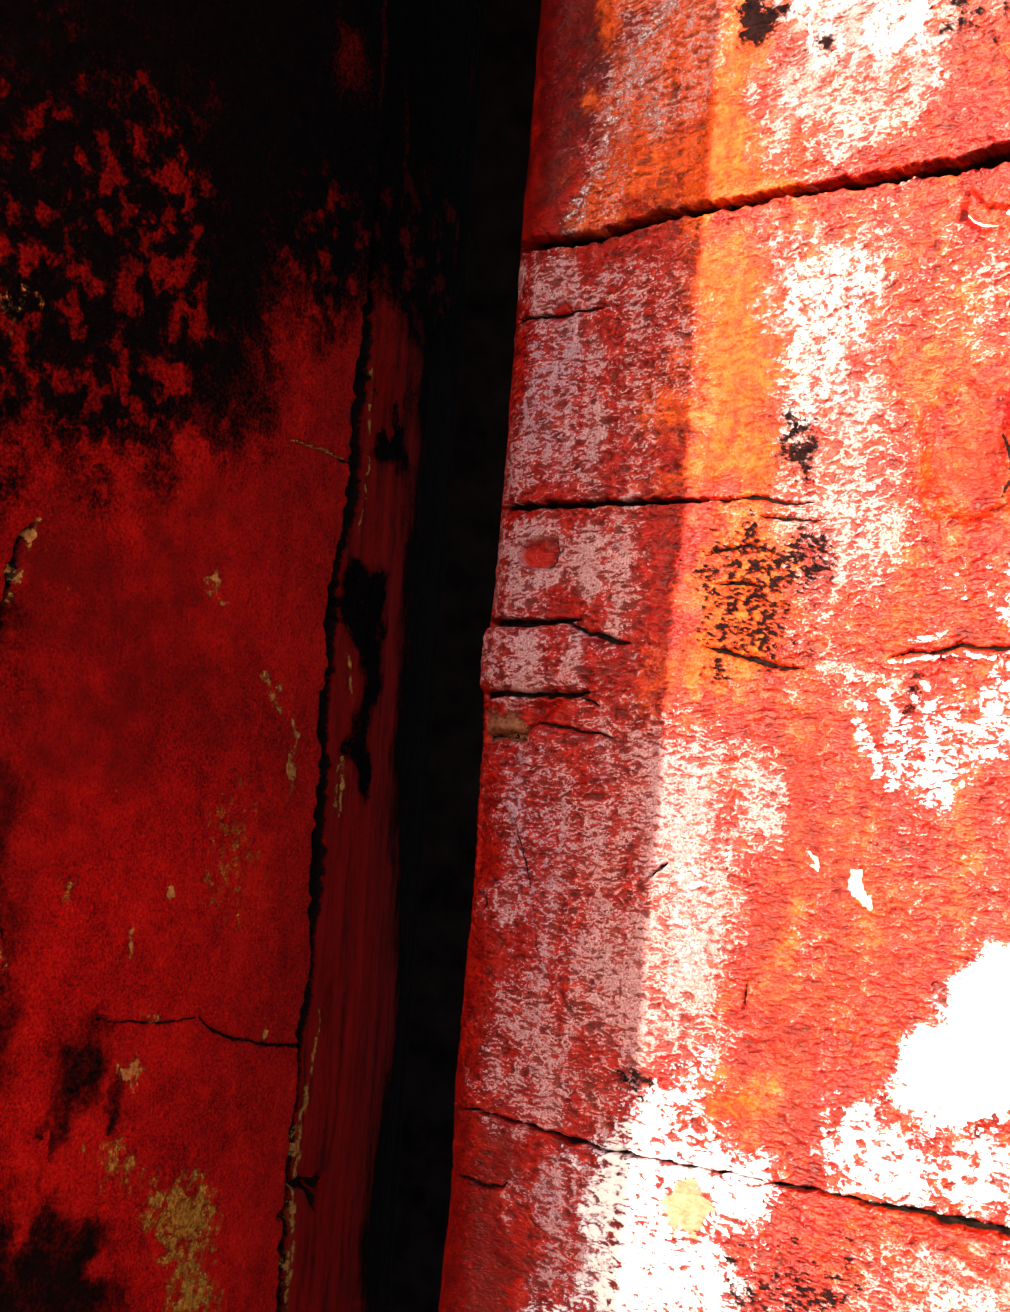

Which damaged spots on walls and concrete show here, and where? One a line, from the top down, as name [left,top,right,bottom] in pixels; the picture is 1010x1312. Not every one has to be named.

crack [0,517,42,629]
crack [707,514,827,588]
crack [499,618,631,645]
crack [702,645,805,671]
crack [97,273,374,1312]
spalling [848,869,873,910]
peeling [517,767,785,1312]
peeling [811,940,1010,1228]
damp [0,1178,128,1312]
flaking render [101,1139,224,1312]
crack [459,1175,508,1188]